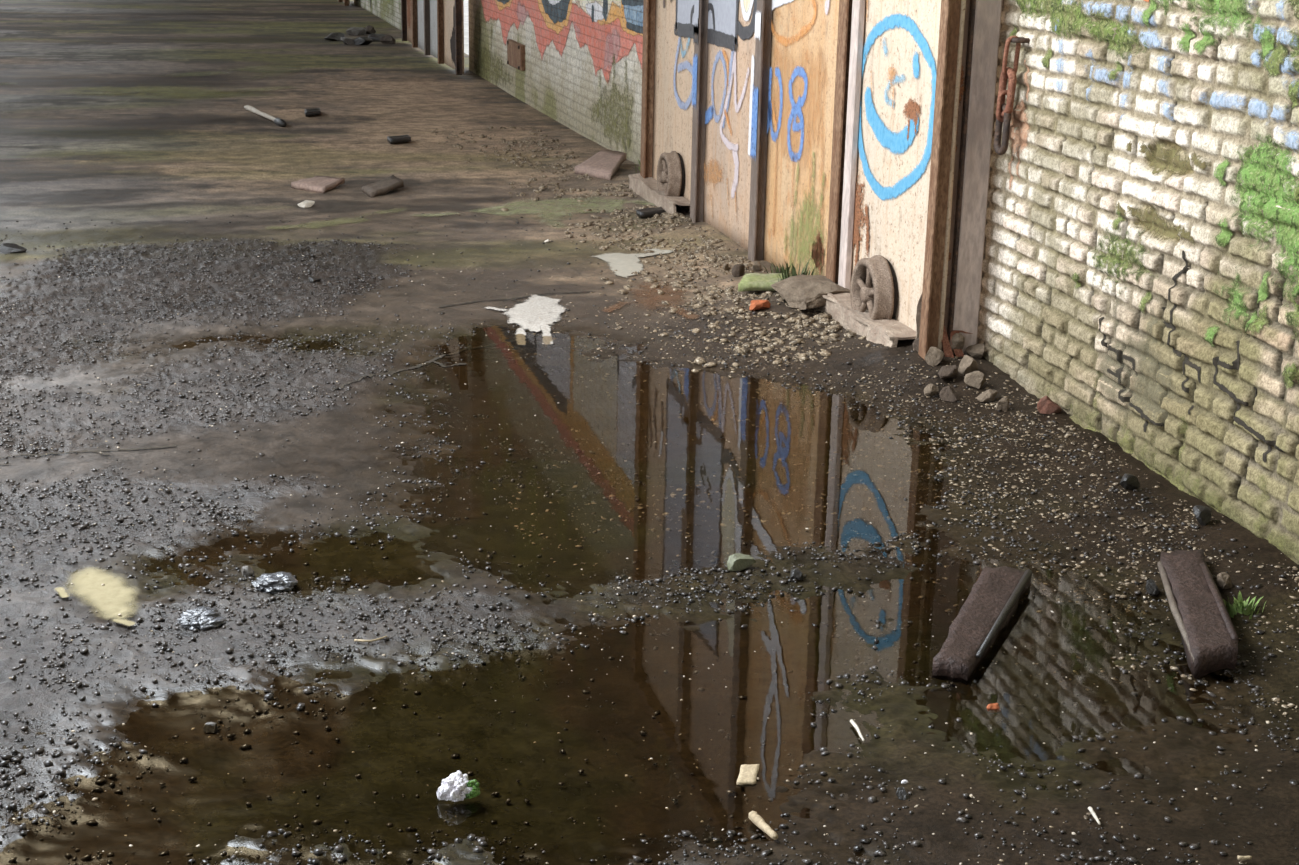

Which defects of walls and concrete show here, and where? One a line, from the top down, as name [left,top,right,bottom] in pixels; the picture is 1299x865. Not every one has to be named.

rust [1008,60,1030,189]
crack [1099,250,1285,462]